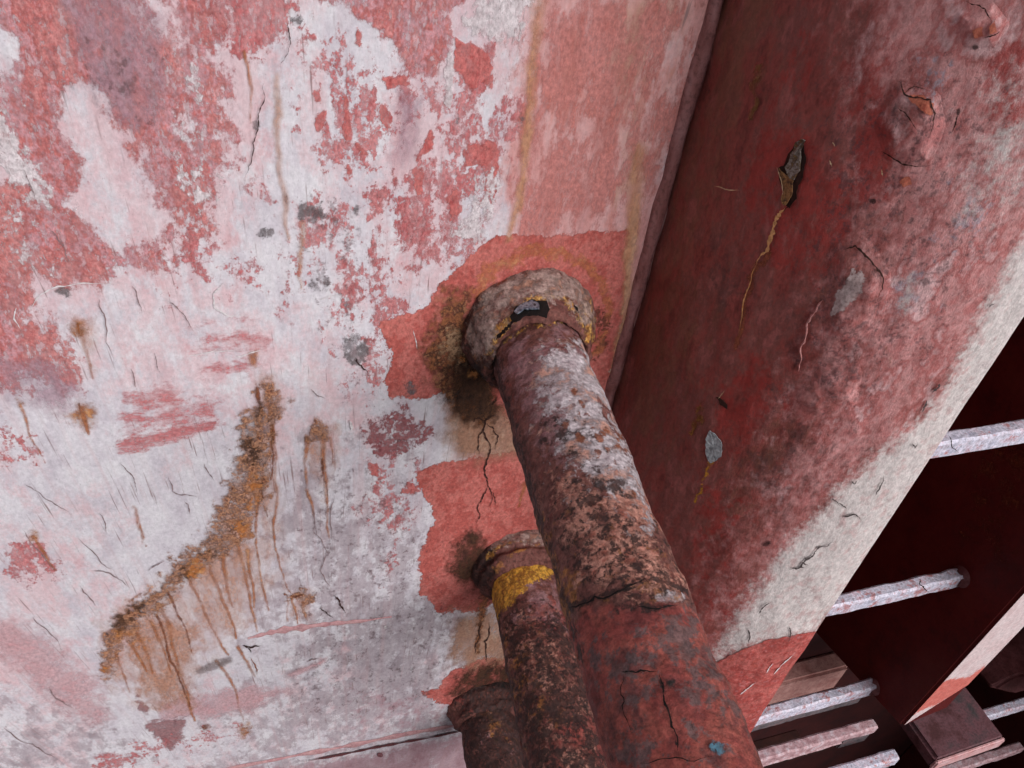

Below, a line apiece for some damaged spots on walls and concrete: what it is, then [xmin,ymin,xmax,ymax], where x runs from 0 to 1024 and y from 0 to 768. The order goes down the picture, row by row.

peeling [777,139,806,212]
peeling [0,0,699,615]
peeling [830,268,865,316]
crack [847,245,884,301]
corrosion [417,286,500,427]
corrosion [304,418,333,511]
crack [473,396,499,524]
peeling [705,431,722,463]
corrosion [99,381,294,730]
corrosion [284,585,316,624]